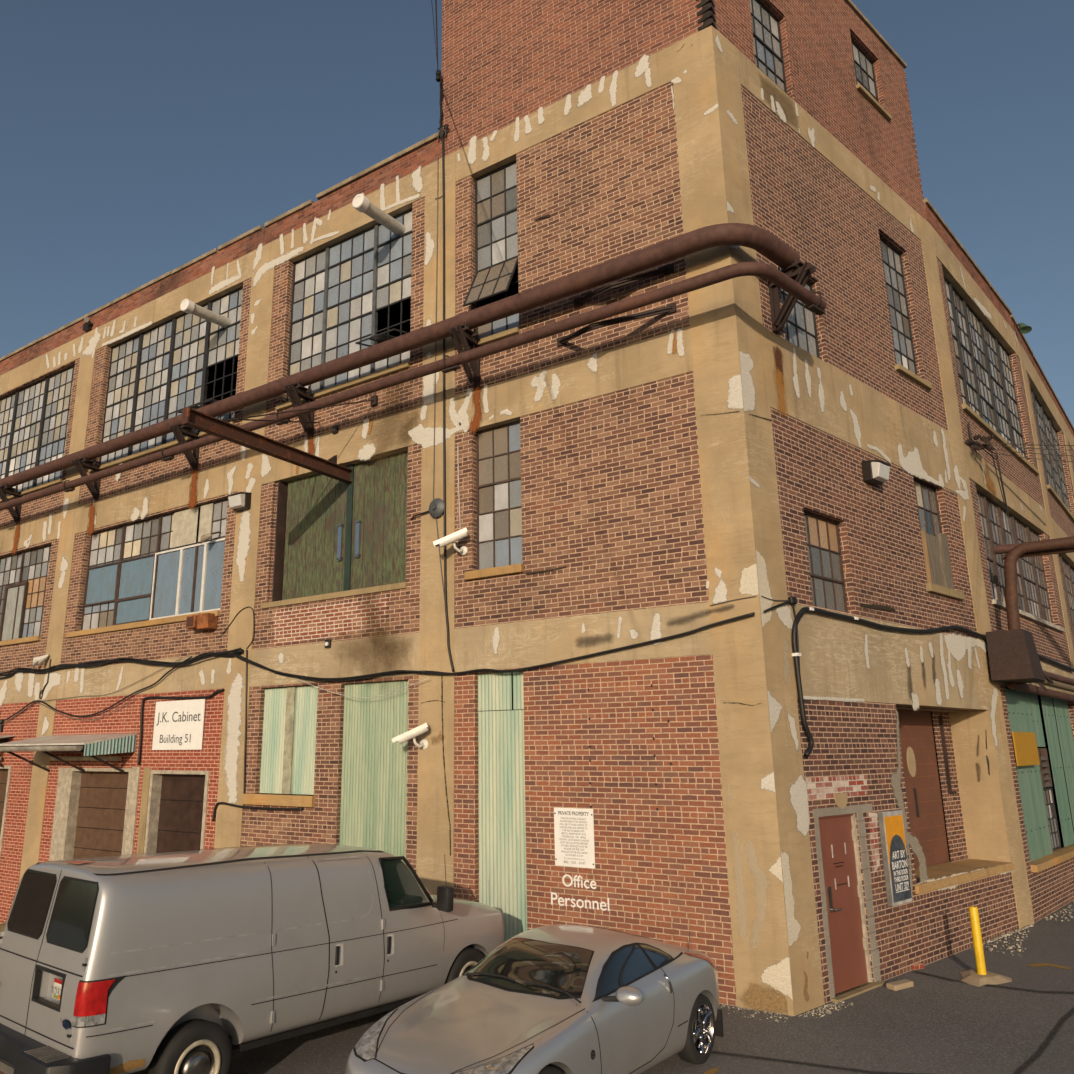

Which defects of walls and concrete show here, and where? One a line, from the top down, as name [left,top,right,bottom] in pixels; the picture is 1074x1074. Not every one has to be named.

peeling [564,70,618,115]
peeling [761,88,815,147]
peeling [380,166,423,211]
peeling [209,210,339,295]
peeling [408,372,512,449]
peeling [727,351,755,412]
rust [774,347,786,414]
peeling [839,384,969,522]
peeling [905,633,988,705]
peeling [199,658,243,803]
peeling [790,774,867,836]
peeling [743,851,809,1013]